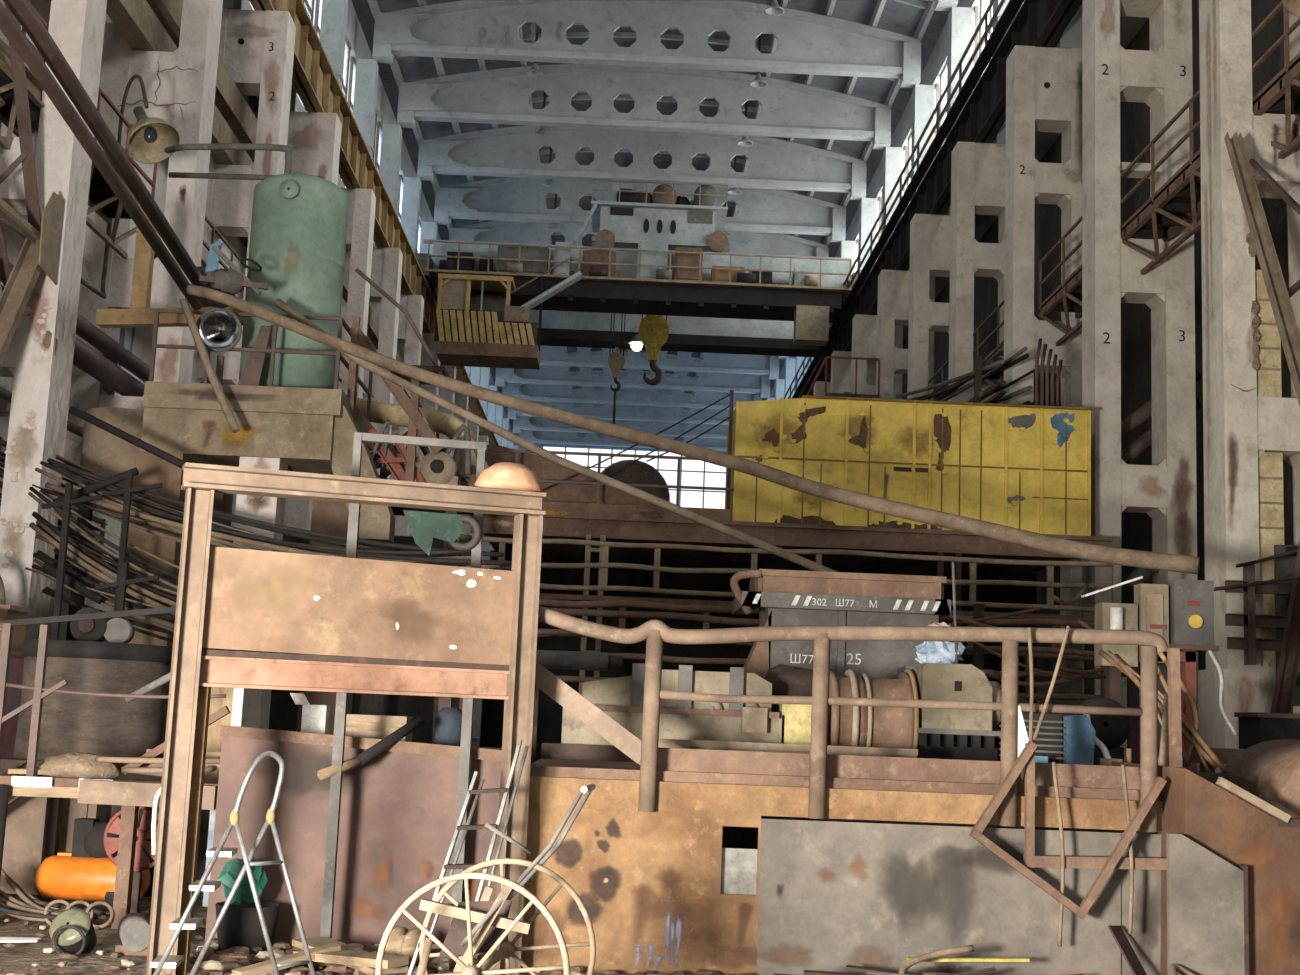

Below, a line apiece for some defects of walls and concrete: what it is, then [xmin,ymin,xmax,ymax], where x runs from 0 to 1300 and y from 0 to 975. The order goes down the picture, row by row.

crack [118,61,198,120]
corrosion [1143,463,1190,556]